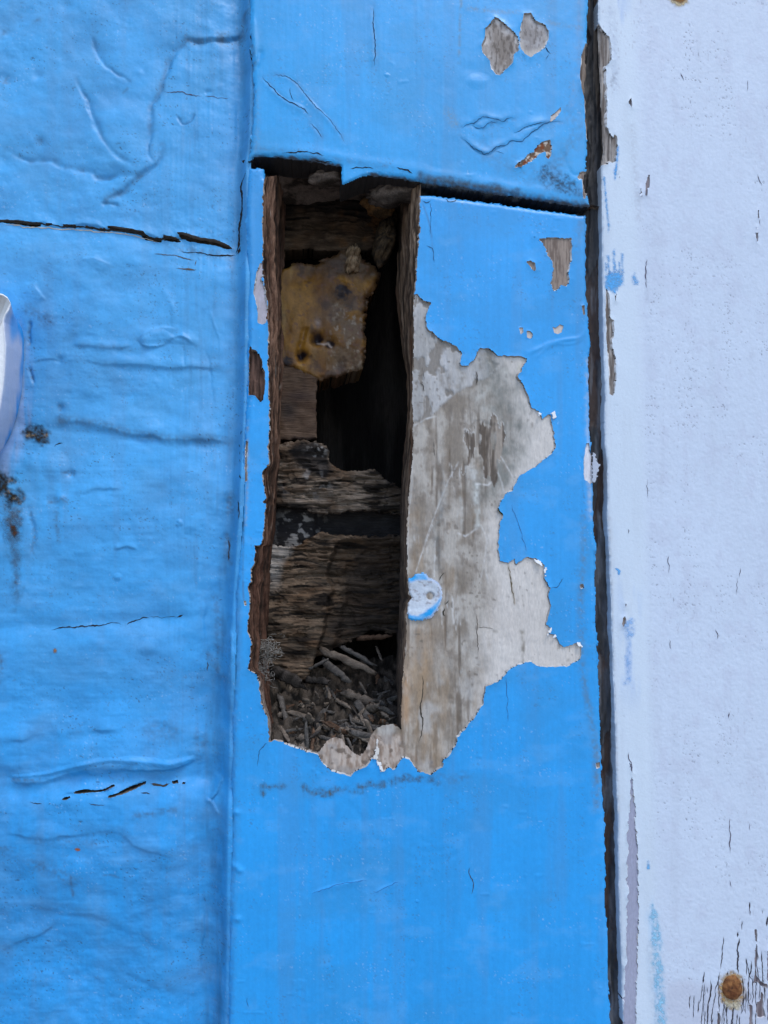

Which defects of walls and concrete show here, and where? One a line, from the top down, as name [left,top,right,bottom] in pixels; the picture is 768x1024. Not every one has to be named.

peeling [481,13,549,75]
peeling [580,24,618,167]
crack [0,175,245,270]
peeling [605,290,617,396]
peeling [244,175,583,777]
crack [31,780,186,806]
rust [718,972,743,1010]